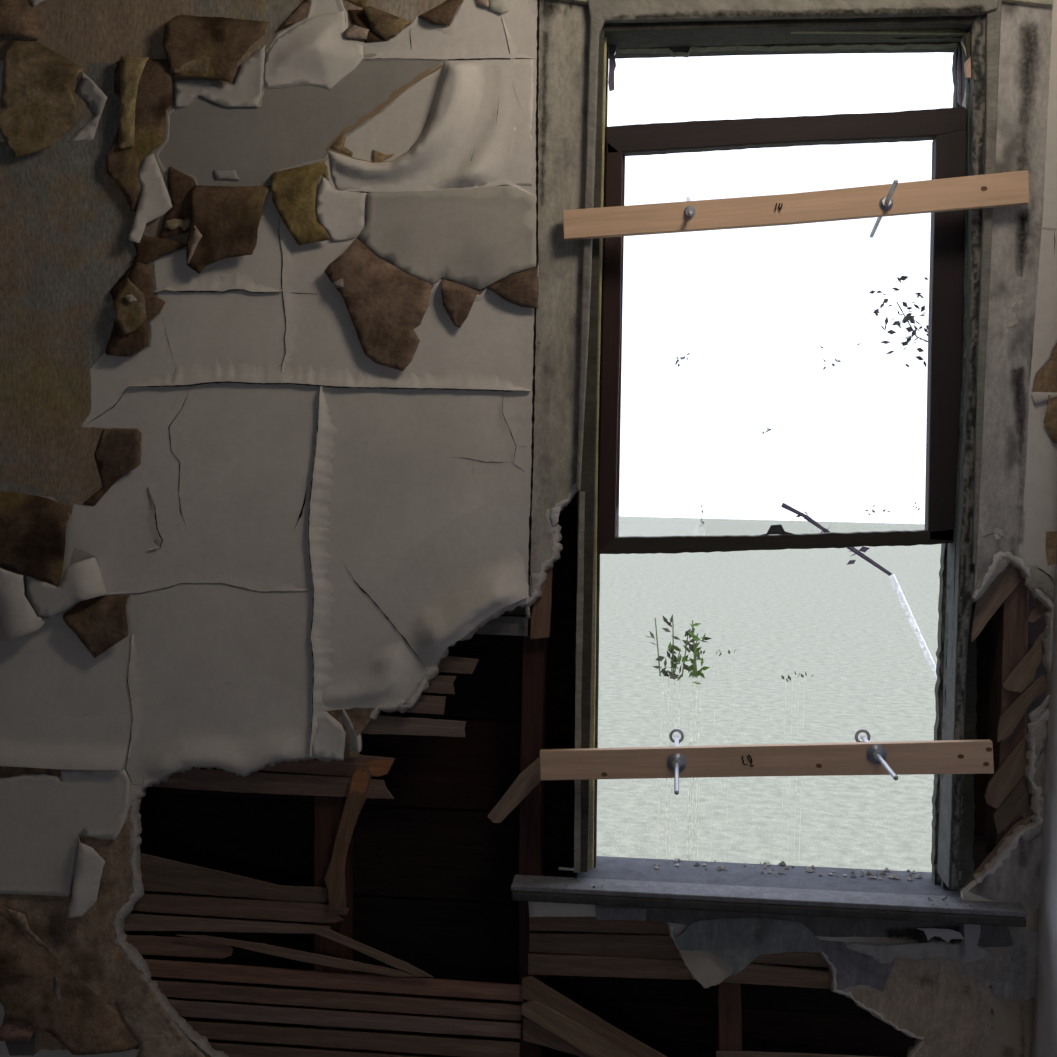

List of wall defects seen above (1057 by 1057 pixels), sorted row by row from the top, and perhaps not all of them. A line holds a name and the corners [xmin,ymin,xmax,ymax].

peeling [87,63,120,161]
damp [620,6,985,18]
peeling [972,15,985,176]
damp [1022,27,1037,107]
damp [1018,213,1028,269]
damp [1013,367,1024,442]
crack [87,217,537,756]
flaking render [370,483,577,720]
peeling [934,208,1055,890]
flaking render [113,752,347,1057]
peeling [667,918,1011,1057]